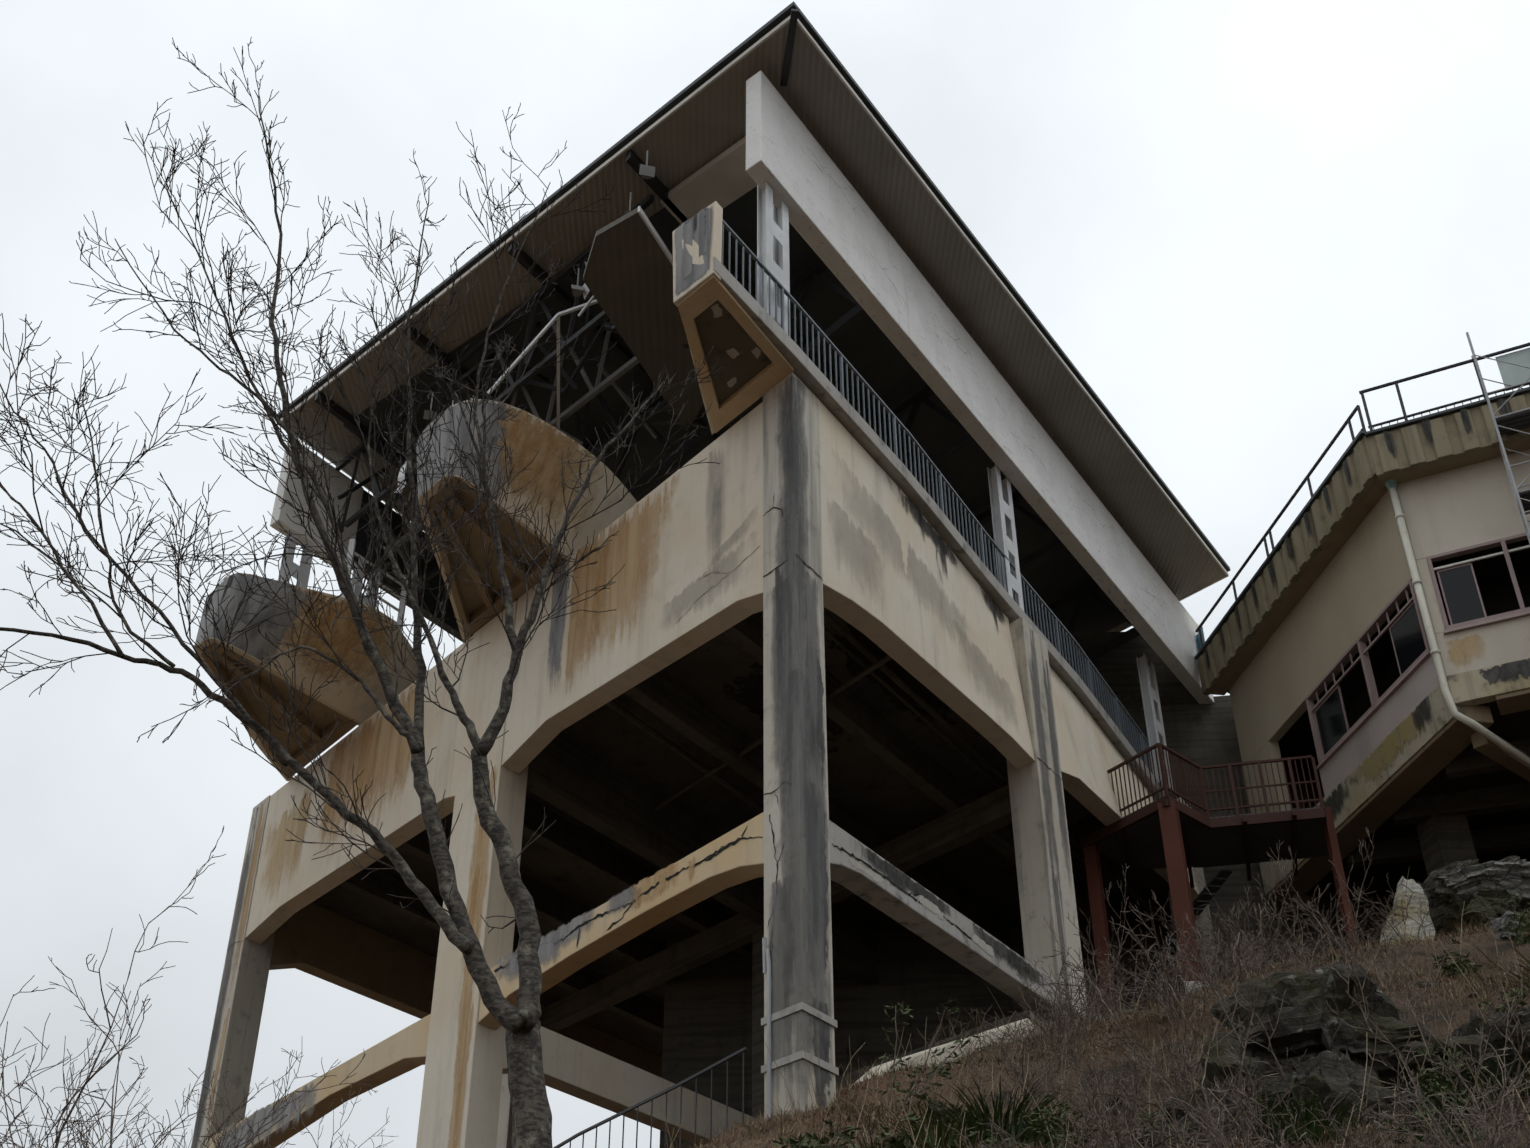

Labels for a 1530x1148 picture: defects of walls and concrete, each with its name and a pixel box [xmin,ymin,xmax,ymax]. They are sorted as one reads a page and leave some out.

corrosion [497,405,577,502]
corrosion [292,589,391,674]
corrosion [566,489,666,677]
water stain [770,376,829,1081]
water stain [898,488,957,573]
water stain [981,587,1004,627]
water stain [1480,658,1530,684]
corrosion [239,685,415,948]
corrosion [467,812,489,936]
crack [554,782,785,945]
crack [832,843,972,939]
corrosion [448,964,473,1148]